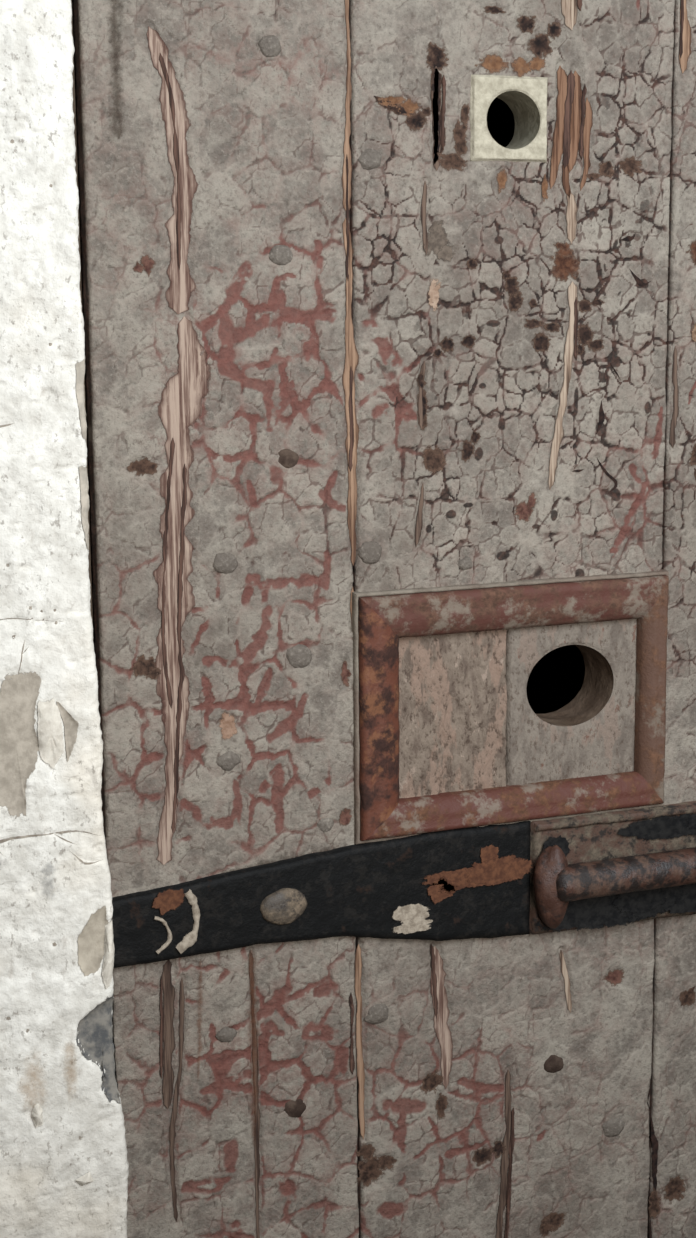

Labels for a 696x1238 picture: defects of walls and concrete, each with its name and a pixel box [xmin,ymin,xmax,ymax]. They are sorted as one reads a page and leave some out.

crack [621,234,651,286]
crack [572,363,619,492]
spalling [0,672,79,819]
peeling [154,889,200,954]
rust [423,845,532,904]
spalling [76,906,121,1104]